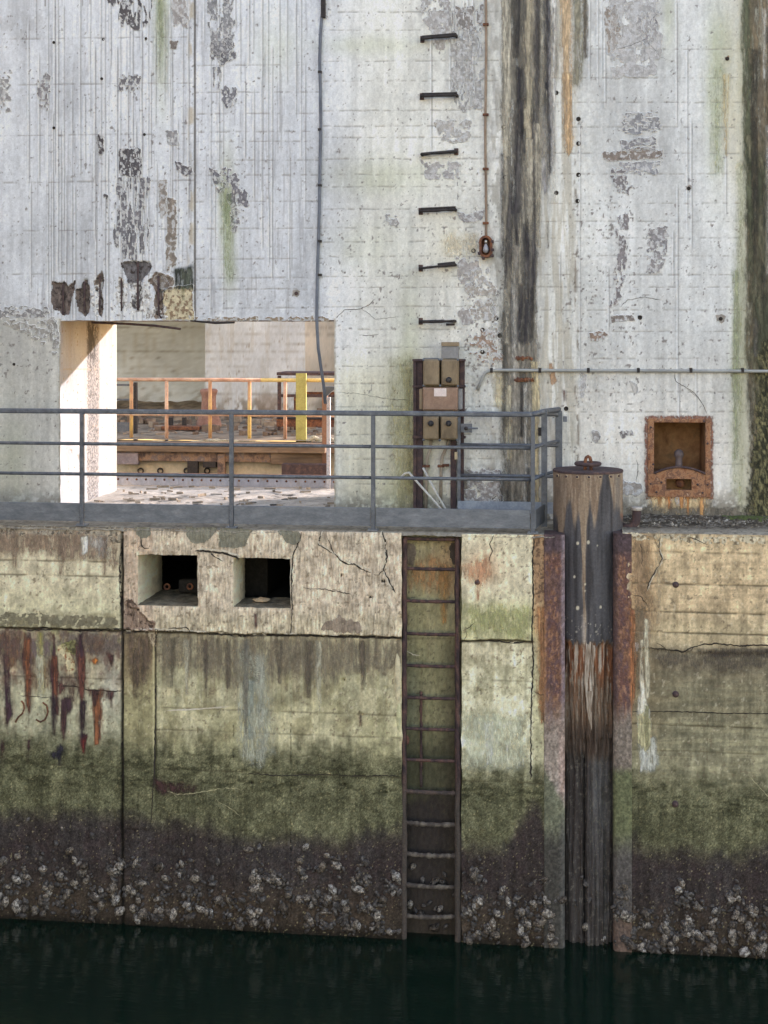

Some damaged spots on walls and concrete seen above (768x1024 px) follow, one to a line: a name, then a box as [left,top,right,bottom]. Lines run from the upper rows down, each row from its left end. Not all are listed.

peeling [207,0,238,109]
peeling [603,0,664,79]
peeling [602,111,664,196]
peeling [0,147,329,356]
damp [500,0,557,519]
damp [626,0,768,516]
rust [644,415,714,515]
rust [0,633,114,765]
crack [2,531,400,907]
crack [462,534,543,779]
crack [644,642,768,653]